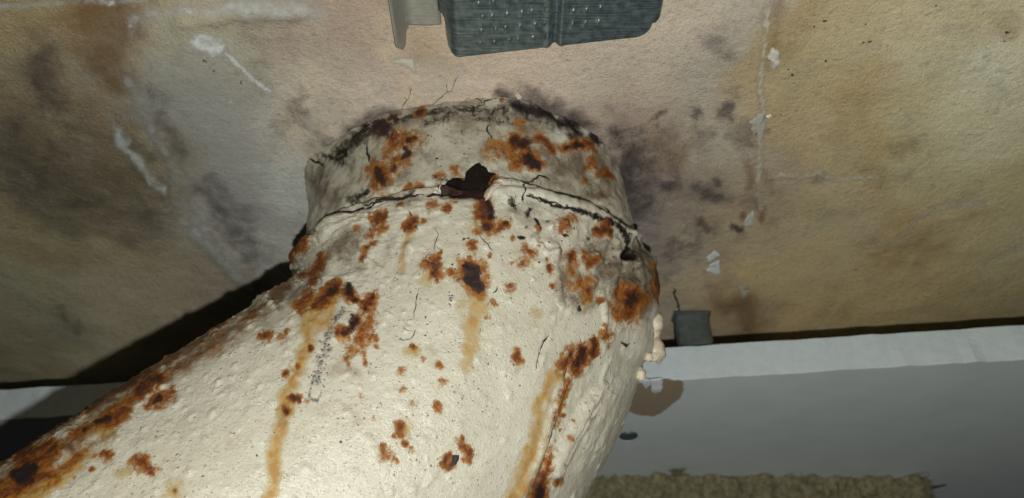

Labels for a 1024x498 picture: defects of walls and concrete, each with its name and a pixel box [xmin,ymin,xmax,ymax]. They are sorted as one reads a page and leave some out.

leakage [190,34,271,93]
crack [313,194,439,259]
rust [353,129,460,273]
peeling [483,175,503,201]
rust [482,117,616,184]
crack [500,175,645,297]
leakage [620,147,640,186]
rust [0,235,379,498]
rust [405,343,448,385]
rust [420,197,660,498]